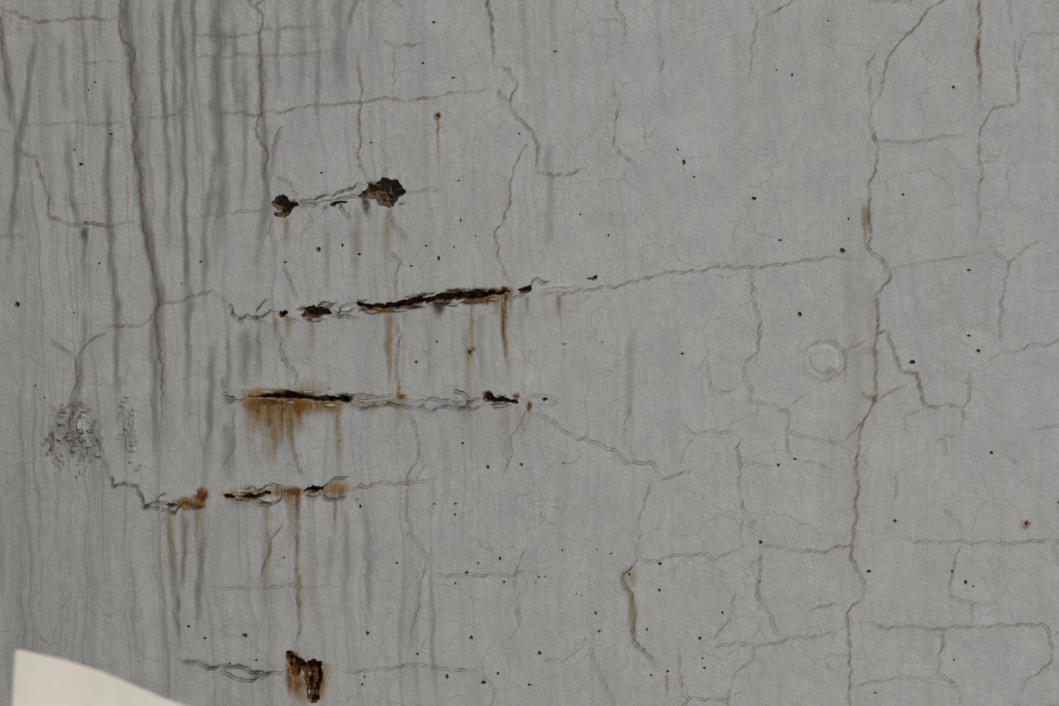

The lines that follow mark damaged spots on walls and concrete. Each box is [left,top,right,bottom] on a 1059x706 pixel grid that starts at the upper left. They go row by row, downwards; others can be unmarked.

crack [865,0,1059,223]
spalling [271,194,299,218]
spalling [330,177,406,208]
spalling [301,304,332,321]
rust [361,286,511,353]
spalling [349,285,532,313]
crack [0,0,546,705]
crack [184,0,974,706]
rust [248,389,349,433]
rust [177,488,208,509]
rust [275,483,345,516]
crack [861,538,1059,697]